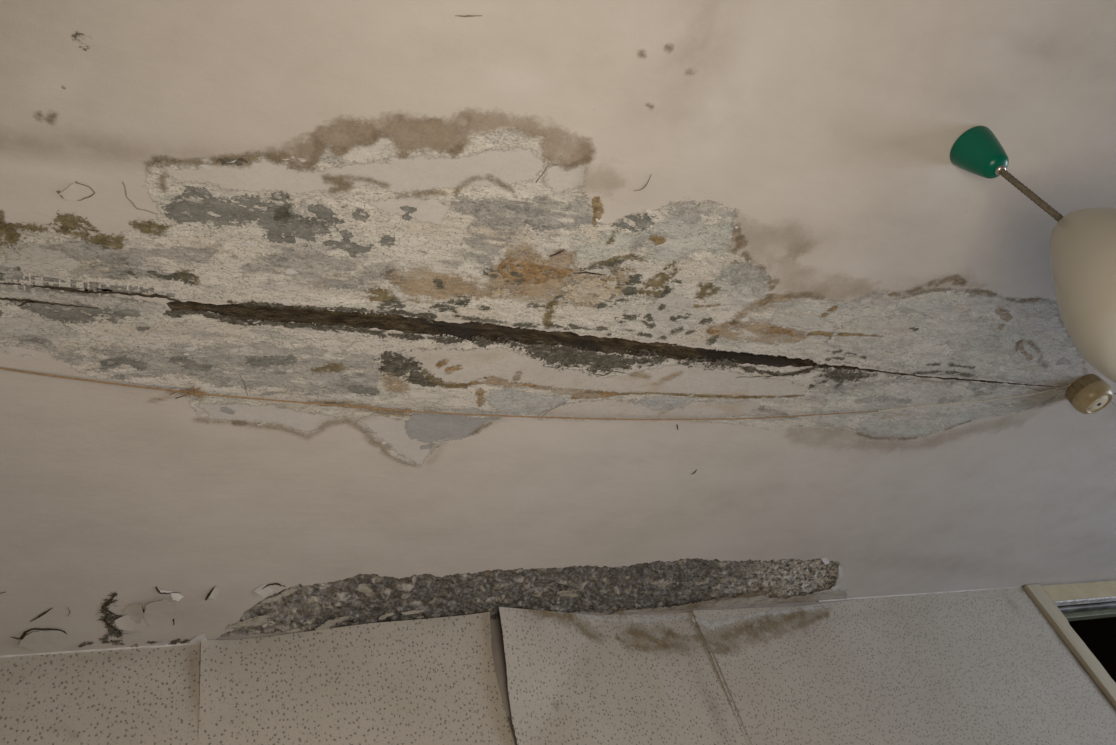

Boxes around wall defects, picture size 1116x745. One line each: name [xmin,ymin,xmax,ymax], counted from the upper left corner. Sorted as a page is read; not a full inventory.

water stain [148,112,591,192]
crack [0,283,1062,387]
peeling [0,128,1088,467]
spalling [11,558,848,651]